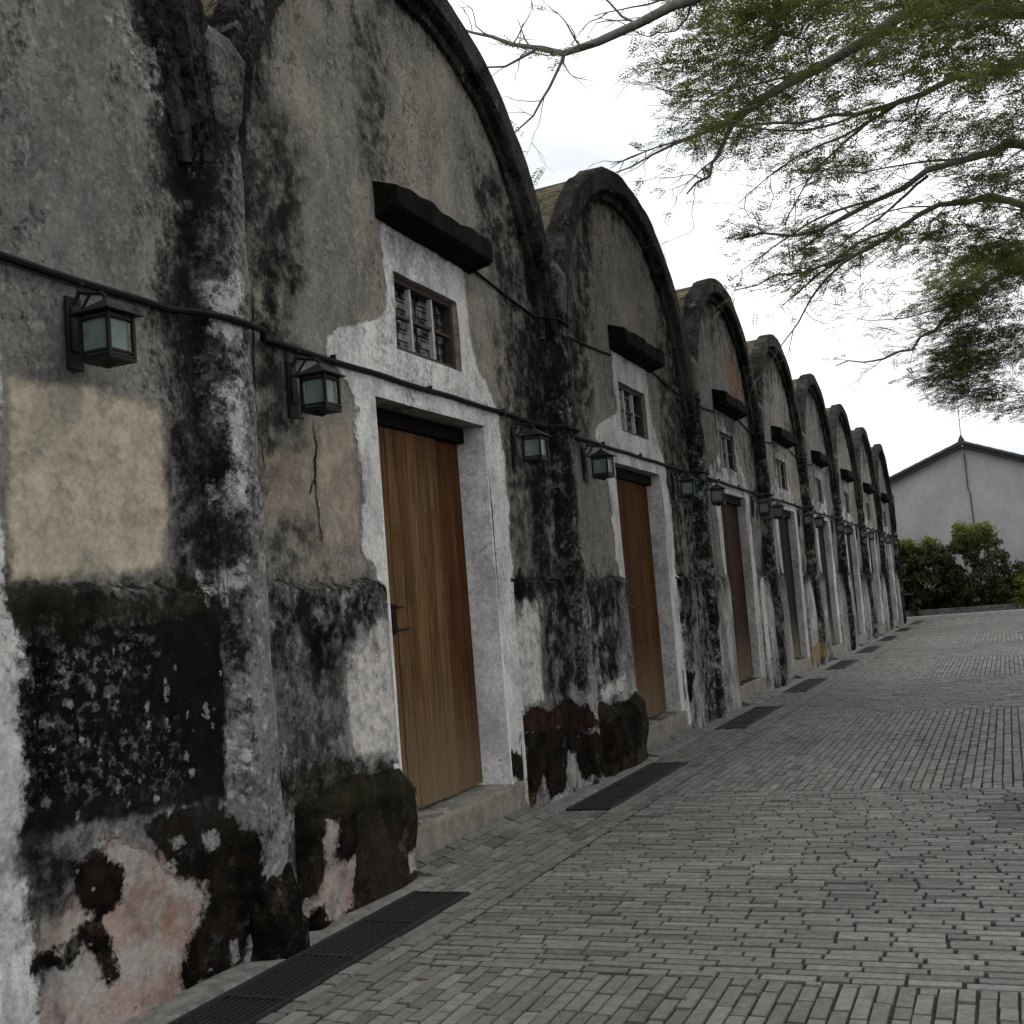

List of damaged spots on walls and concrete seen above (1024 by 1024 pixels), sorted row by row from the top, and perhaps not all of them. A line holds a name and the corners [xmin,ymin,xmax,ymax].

water stain [250,75,302,314]
water stain [163,123,235,585]
crack [309,423,323,539]
water stain [476,167,622,724]
water stain [651,275,722,722]
water stain [12,602,64,642]
water stain [272,577,388,762]
peeling [30,794,268,1024]